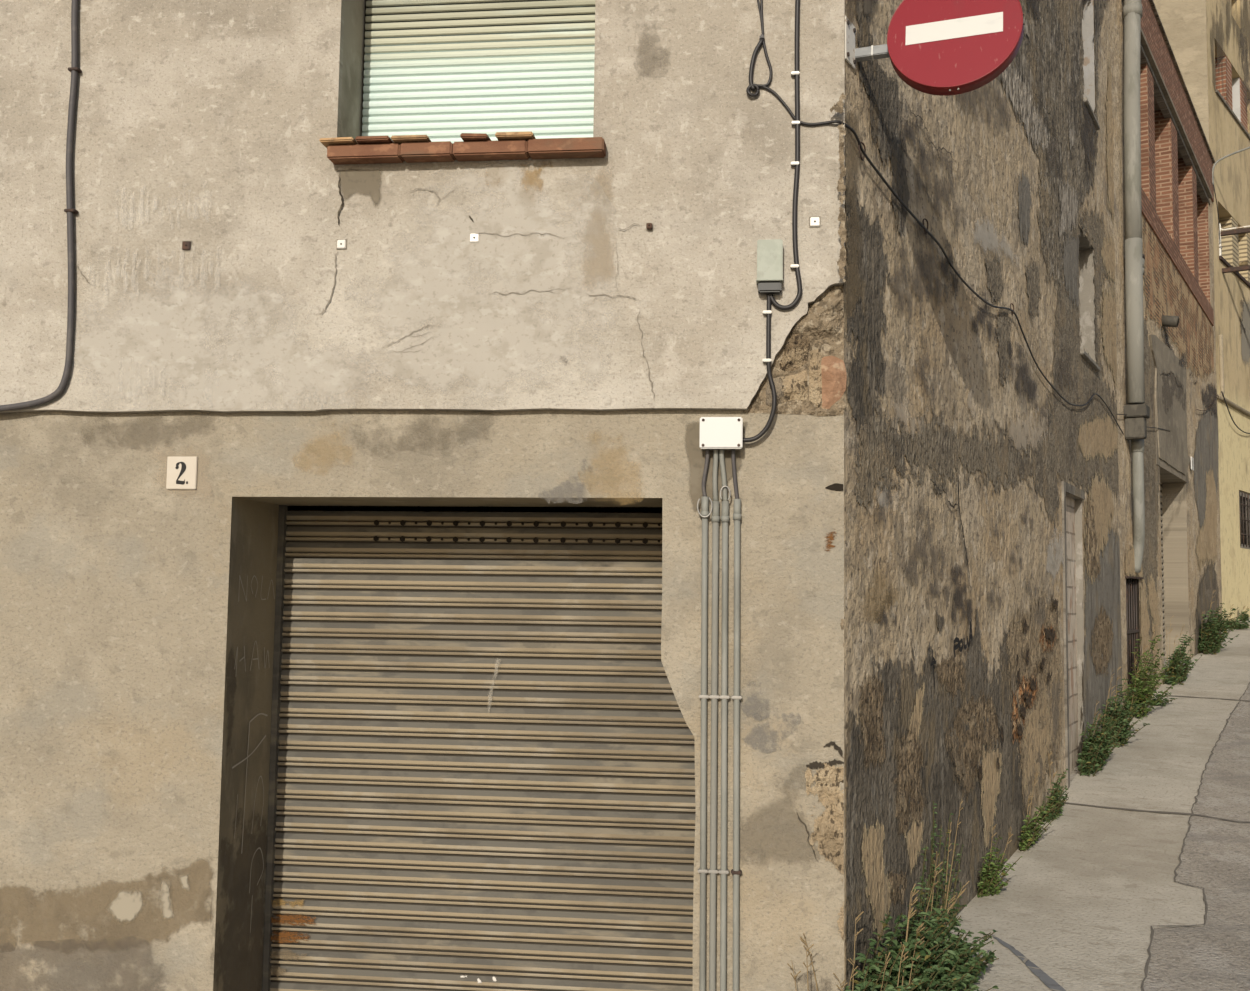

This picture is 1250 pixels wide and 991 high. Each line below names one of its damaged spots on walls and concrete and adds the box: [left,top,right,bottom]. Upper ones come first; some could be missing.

crack [314,176,344,315]
peeling [743,0,1119,583]
spalling [1090,602,1114,679]
spalling [805,763,844,883]
spalling [857,591,1064,941]
damp [0,860,212,953]
corrosion [270,900,316,959]